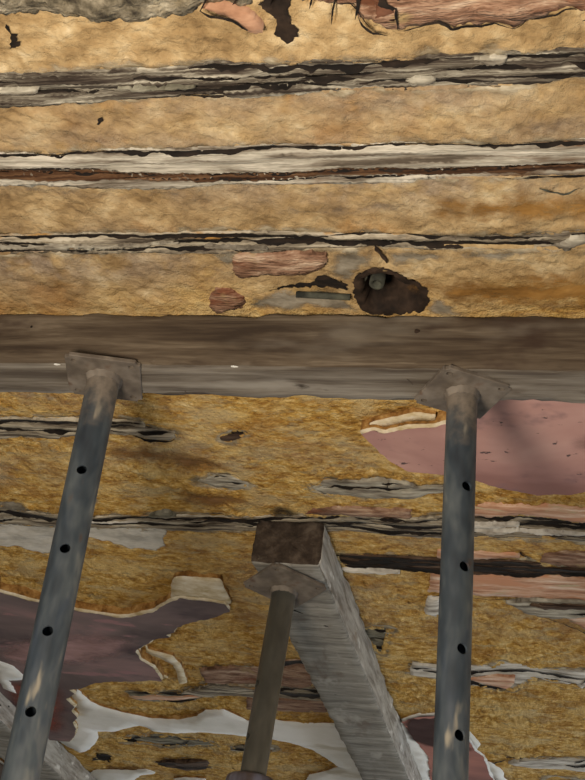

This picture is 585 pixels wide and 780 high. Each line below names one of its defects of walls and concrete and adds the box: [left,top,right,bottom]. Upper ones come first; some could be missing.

spalling [0,0,264,34]
flaking render [317,0,585,30]
crack [331,0,585,36]
peeling [0,86,40,96]
peeling [360,407,446,475]
peeling [474,399,585,536]
flaking render [473,550,585,629]
peeling [48,571,249,753]
peeling [91,768,155,780]
peeling [272,719,362,780]
peeling [401,712,435,780]
peeling [468,732,508,780]